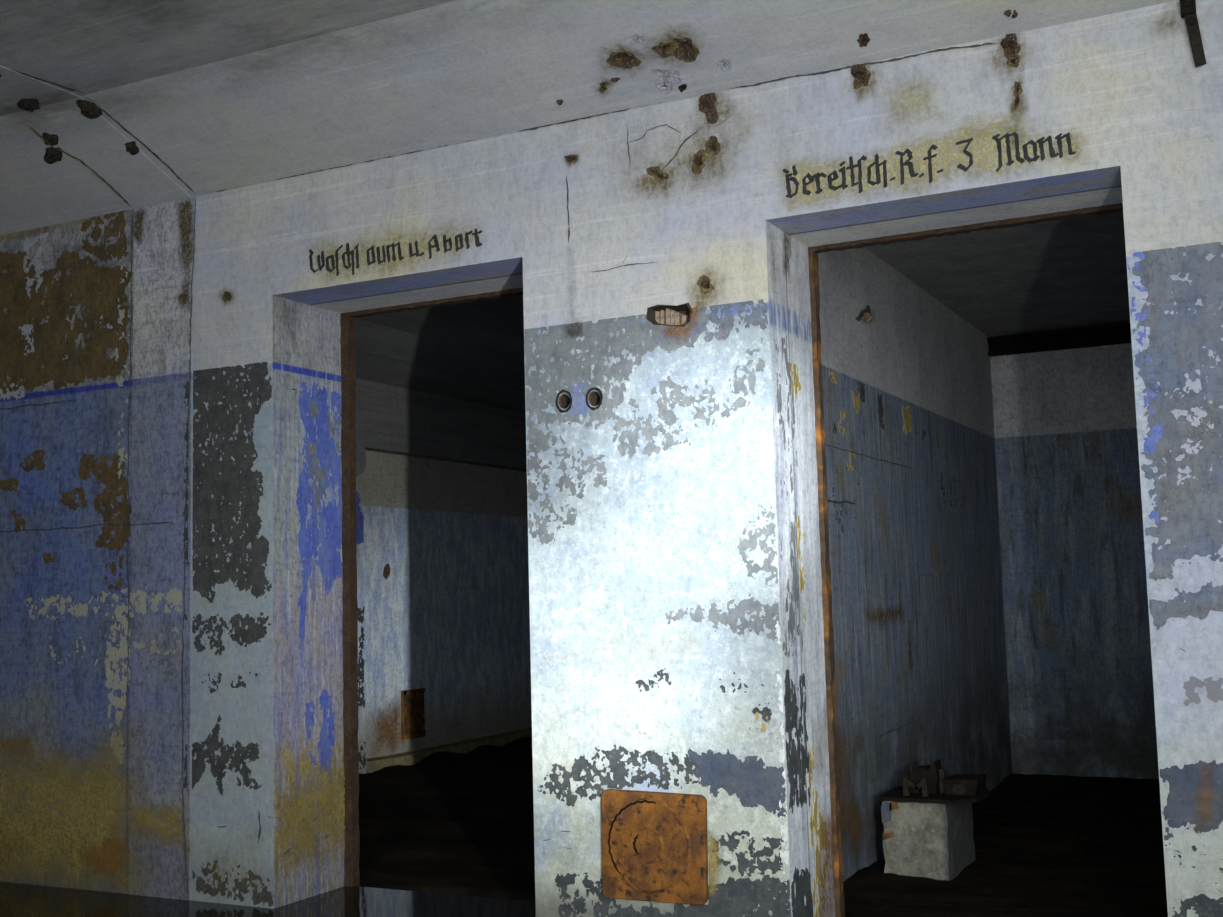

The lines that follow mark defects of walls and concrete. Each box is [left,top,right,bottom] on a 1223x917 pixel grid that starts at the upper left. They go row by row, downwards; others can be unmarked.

spalling [42,132,63,164]
crack [280,140,471,179]
spalling [598,33,700,94]
spalling [689,93,730,177]
crack [521,43,995,172]
peeling [1128,242,1223,630]
peeling [0,211,272,797]
peeling [296,380,364,649]
peeling [524,274,828,917]
peeling [1183,676,1223,706]
peeling [1160,760,1223,868]
peeling [1172,868,1223,917]